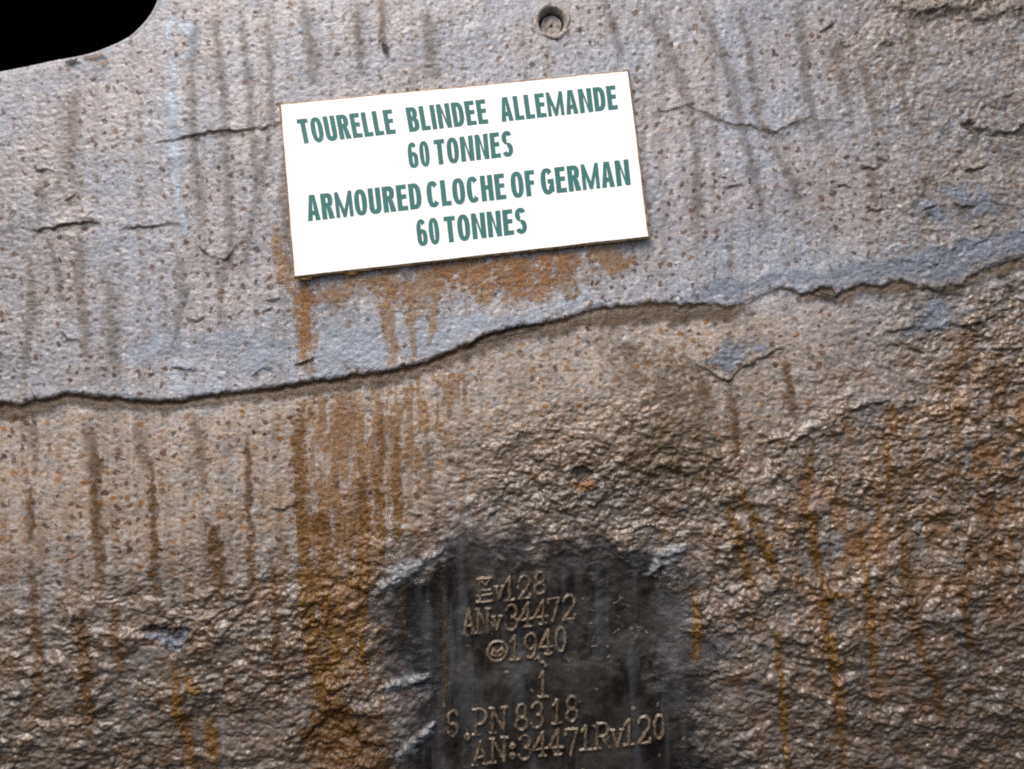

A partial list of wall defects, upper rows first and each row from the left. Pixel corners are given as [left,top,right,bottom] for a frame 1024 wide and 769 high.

crack [154,125,275,143]
crack [652,103,855,136]
crack [35,216,180,232]
crack [0,302,748,421]
corrosion [271,227,636,374]
crack [774,257,1024,304]
corrosion [88,445,106,572]
corrosion [147,469,159,604]
corrosion [244,441,255,599]
corrosion [290,366,467,769]
water stain [642,576,716,712]
corrosion [797,452,878,759]